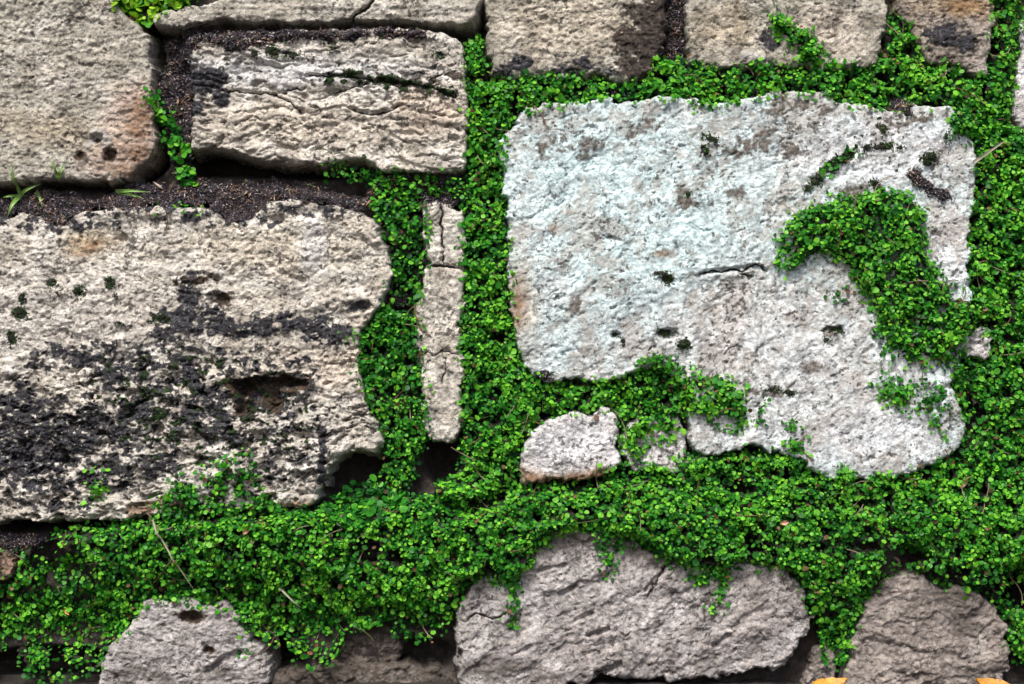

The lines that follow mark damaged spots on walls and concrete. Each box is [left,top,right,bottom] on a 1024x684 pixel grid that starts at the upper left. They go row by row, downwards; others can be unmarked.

crack [699,264,765,276]